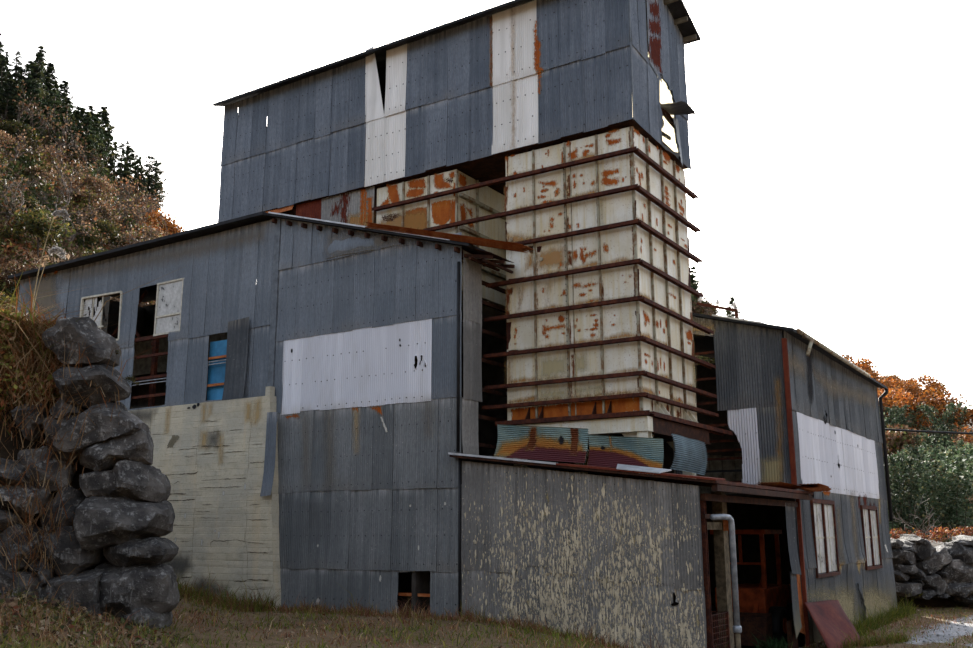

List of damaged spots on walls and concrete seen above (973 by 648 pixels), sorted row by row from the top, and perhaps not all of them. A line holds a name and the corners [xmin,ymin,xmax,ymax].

rust [533,21,542,94]
rust [330,172,474,230]
rust [537,127,685,203]
rust [654,186,690,270]
rust [496,154,669,468]
rust [680,267,711,356]